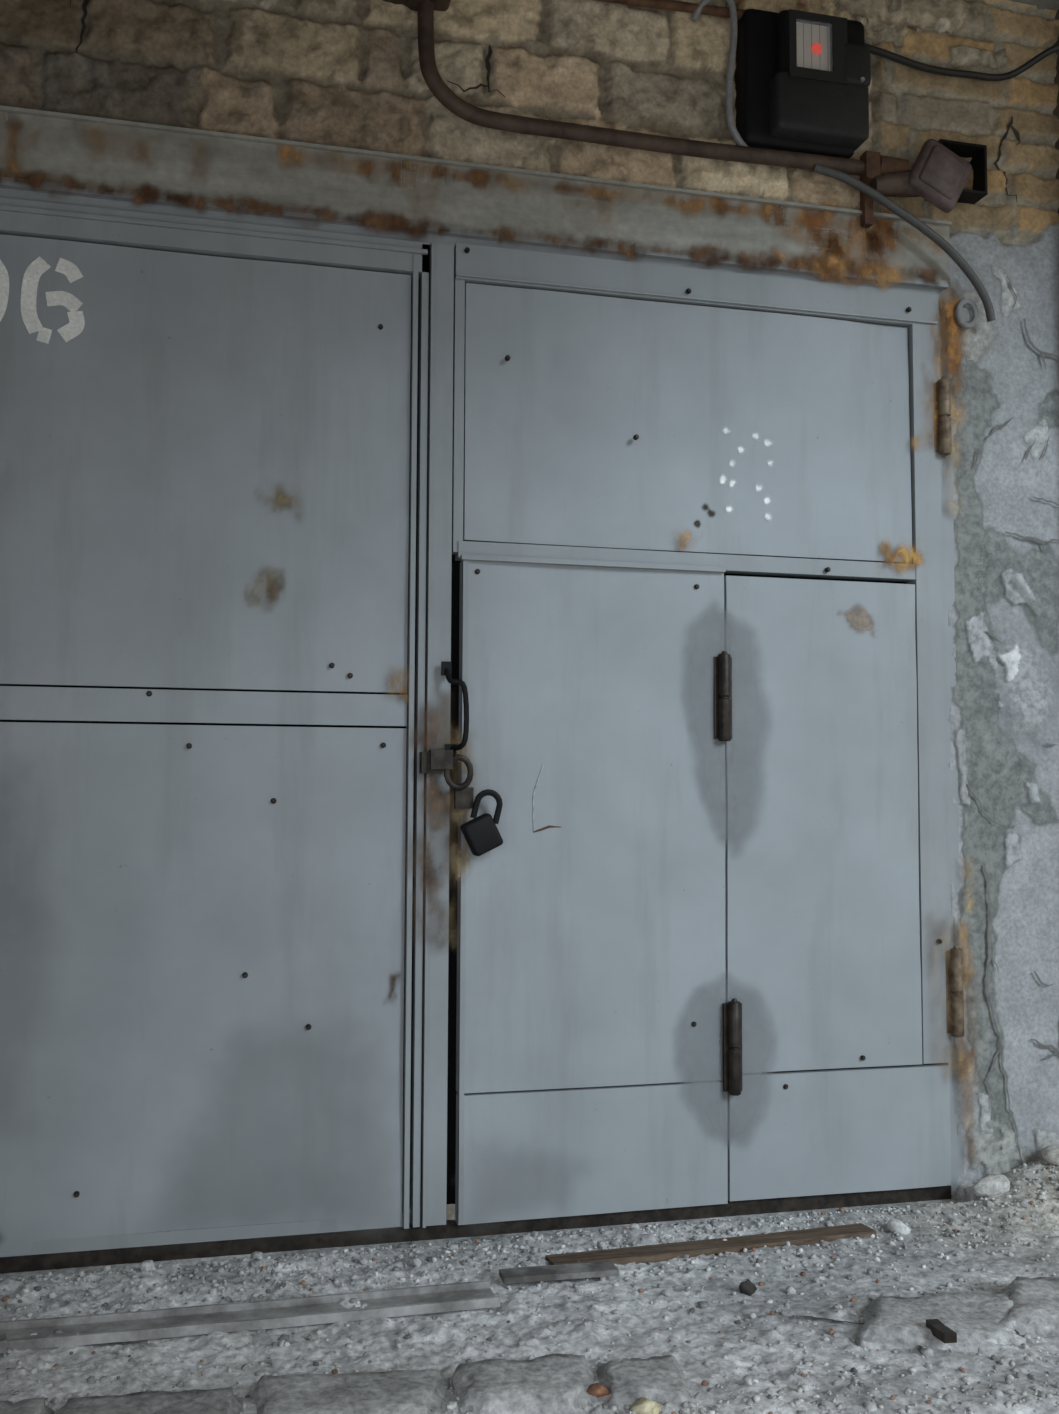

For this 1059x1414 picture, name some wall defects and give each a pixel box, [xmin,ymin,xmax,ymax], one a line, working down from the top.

corrosion [0,124,283,216]
corrosion [303,207,450,238]
corrosion [431,166,516,187]
corrosion [545,235,669,259]
corrosion [665,197,963,462]
corrosion [882,543,921,570]
flaking render [950,264,1059,1174]
corrosion [420,779,470,899]